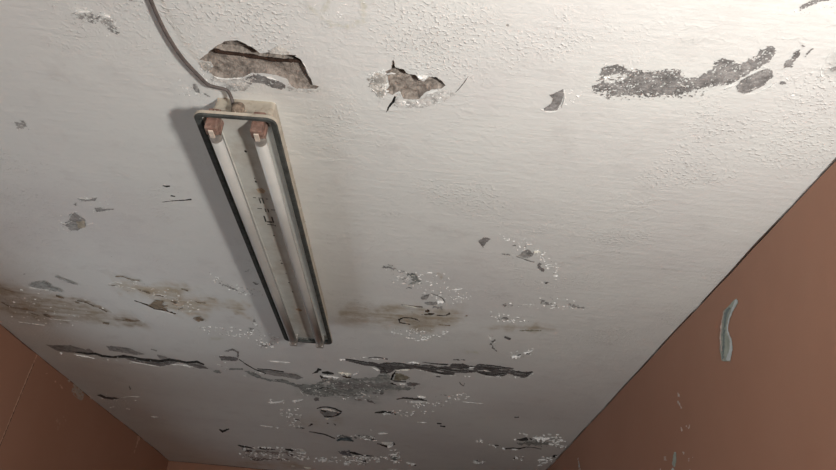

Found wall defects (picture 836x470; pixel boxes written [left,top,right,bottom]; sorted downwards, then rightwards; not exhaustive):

spalling [176,40,322,97]
spalling [368,60,468,112]
peeling [541,89,579,112]
peeling [592,46,789,100]
peeling [784,45,814,68]
peeling [58,196,113,233]
leakage [0,270,255,333]
leakage [331,298,470,341]
peeling [719,299,738,361]
peeling [213,349,427,410]
peeling [233,445,341,470]
peeling [514,433,566,466]